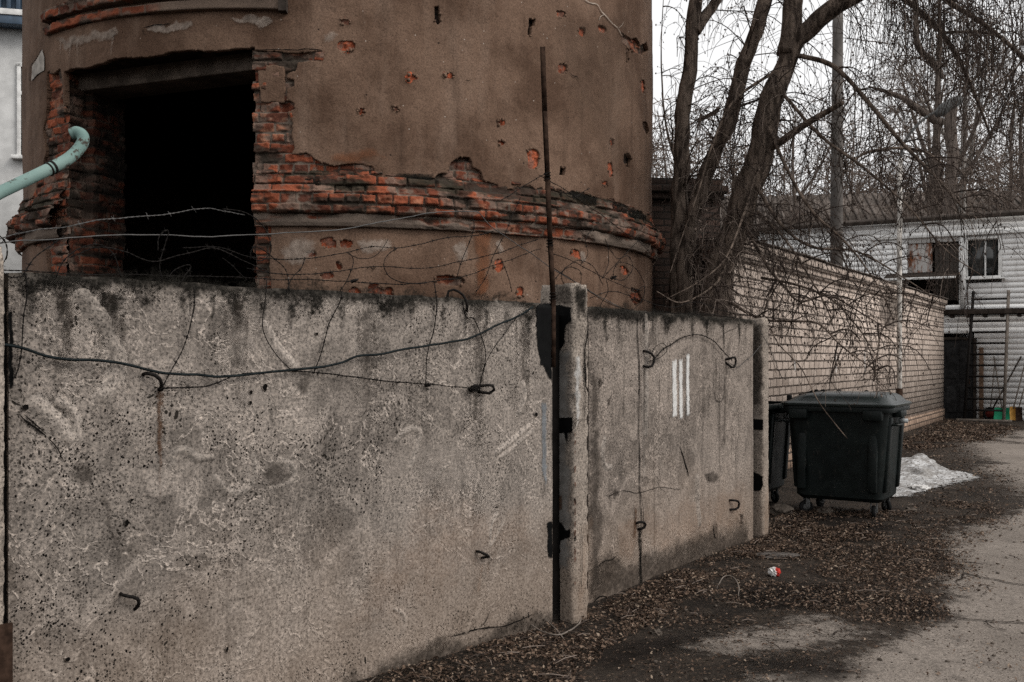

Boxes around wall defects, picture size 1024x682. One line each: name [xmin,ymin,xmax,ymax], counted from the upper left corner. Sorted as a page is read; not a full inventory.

spalling [252,50,377,189]
spalling [31,51,71,276]
spalling [435,156,487,185]
spalling [305,237,353,257]
damp [18,267,546,345]
rust [156,391,164,461]